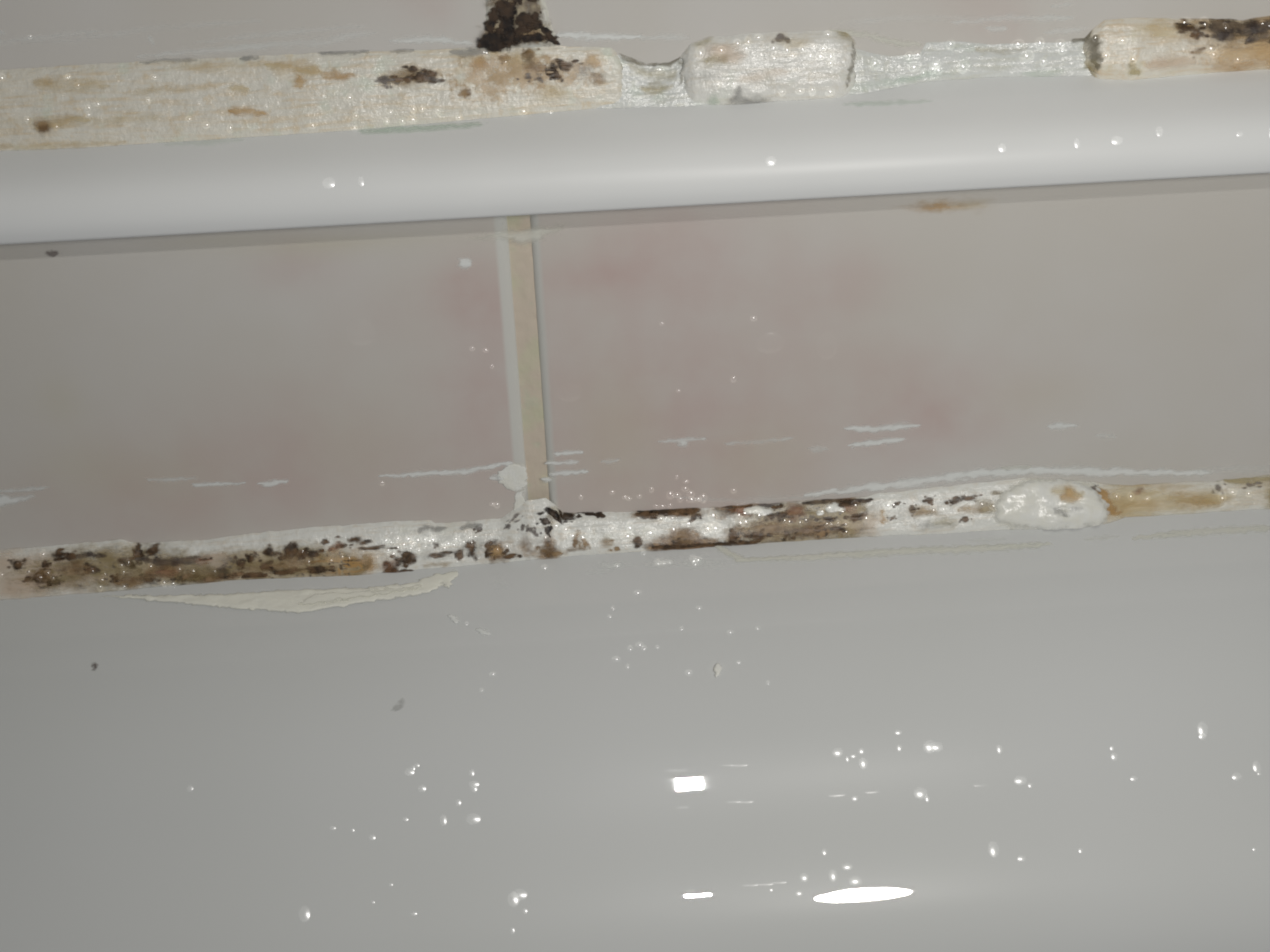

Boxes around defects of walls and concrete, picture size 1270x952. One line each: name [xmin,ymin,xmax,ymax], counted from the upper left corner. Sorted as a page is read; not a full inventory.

damp [376,0,602,97]
damp [1175,18,1270,44]
damp [8,507,606,589]
damp [633,498,873,551]
damp [882,491,998,522]